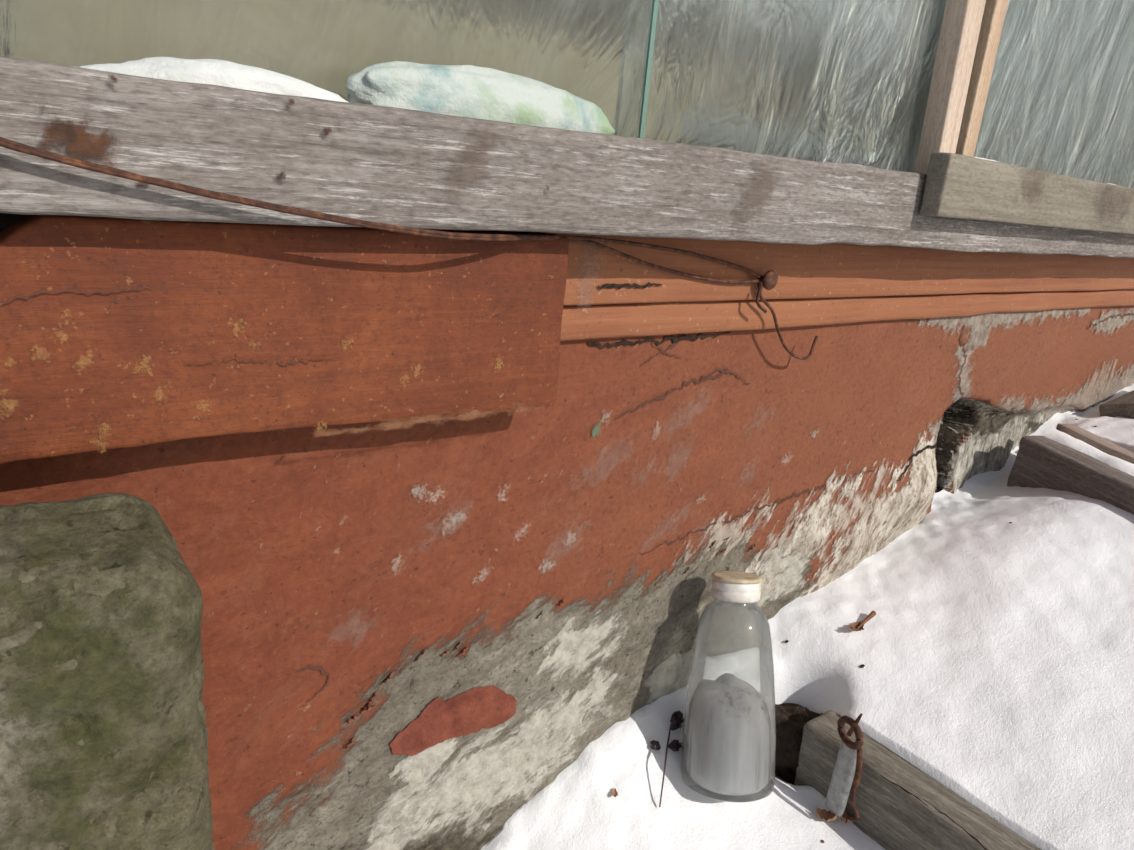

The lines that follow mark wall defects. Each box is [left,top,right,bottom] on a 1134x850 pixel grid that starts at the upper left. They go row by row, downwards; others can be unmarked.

corrosion [39,108,117,165]
peeling [920,308,1134,335]
spalling [930,362,1134,494]
peeling [248,528,818,850]